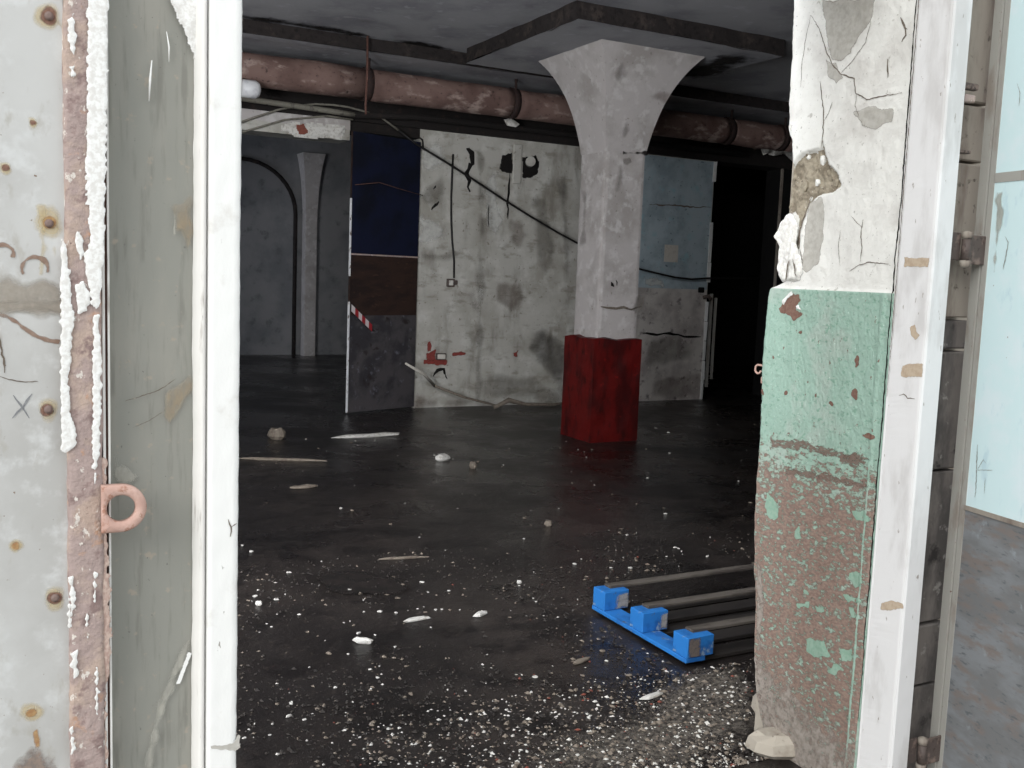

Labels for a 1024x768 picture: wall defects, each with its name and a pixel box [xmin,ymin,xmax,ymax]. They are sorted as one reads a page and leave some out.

corrosion [37,7,56,25]
peeling [823,0,874,83]
peeling [854,106,893,129]
crack [650,202,705,210]
flaking render [789,146,841,272]
crack [643,331,701,339]
crack [798,0,919,718]
peeling [754,433,877,768]
corrosion [17,708,51,768]